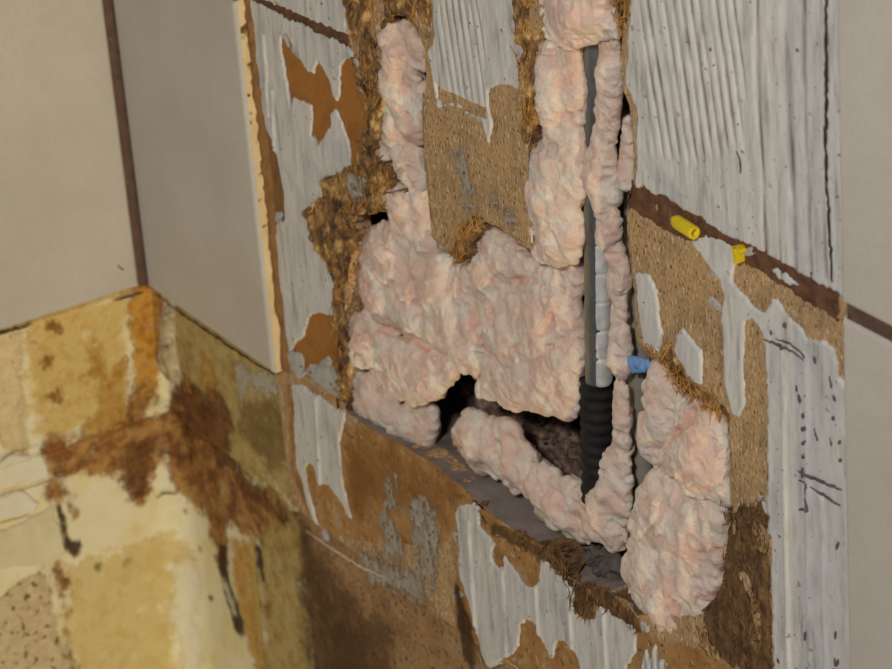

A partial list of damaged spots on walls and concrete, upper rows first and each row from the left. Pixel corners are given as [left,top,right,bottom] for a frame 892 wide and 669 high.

peeling [282,33,367,202]
peeling [422,84,533,258]
crack [823,0,833,282]
peeling [0,322,67,669]
leakage [18,289,130,438]
leakage [175,305,290,500]
peeling [235,313,551,604]
peeling [627,189,840,516]
leakage [61,532,192,669]
leakage [255,513,311,669]
leakage [454,584,474,669]
peeling [502,619,580,669]